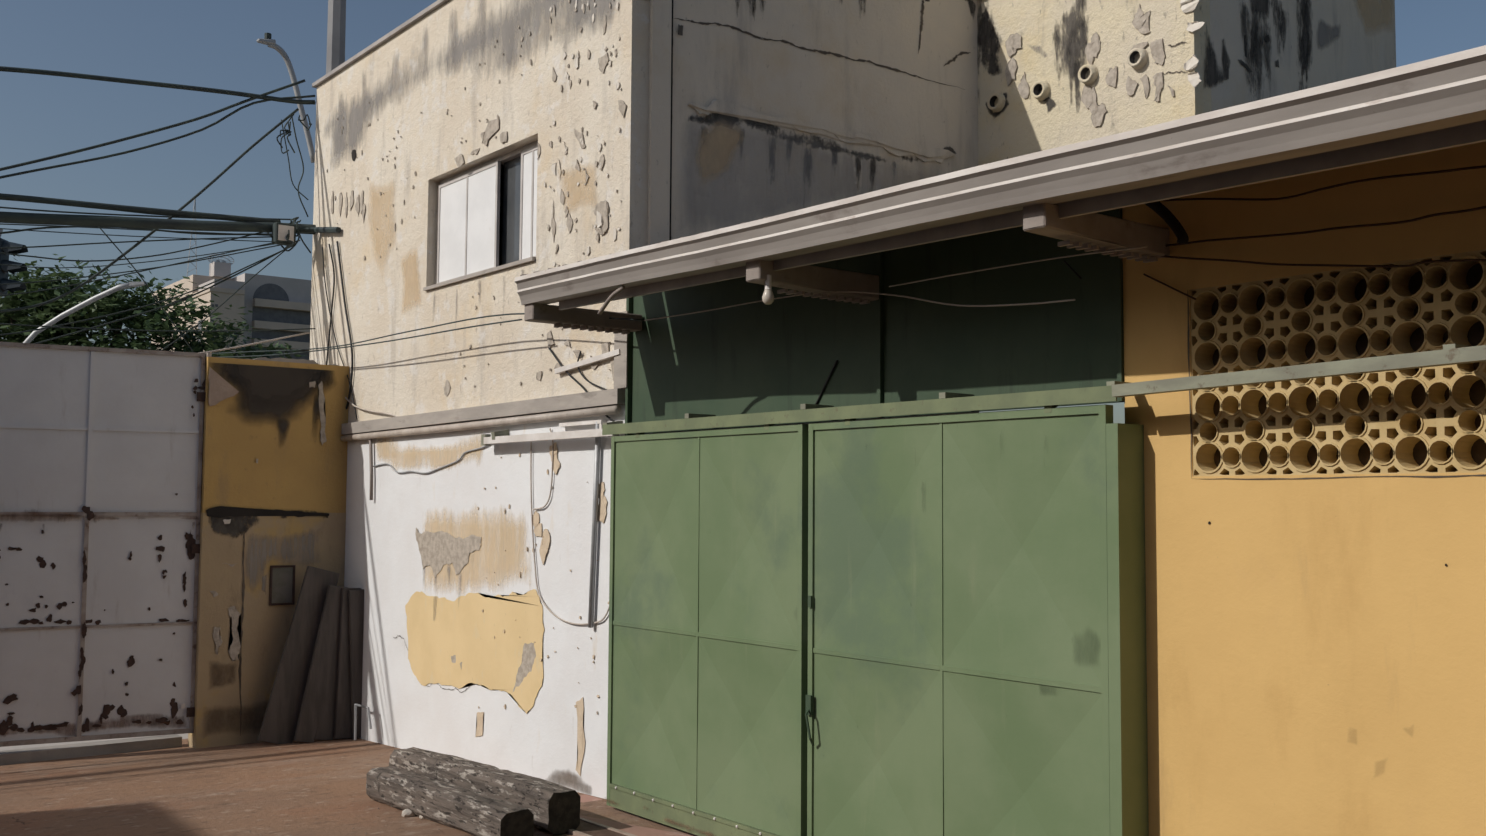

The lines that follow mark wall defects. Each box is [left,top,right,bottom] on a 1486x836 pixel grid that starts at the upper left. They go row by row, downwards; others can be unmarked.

crack [674,0,971,90]
water stain [1033,0,1087,106]
water stain [1204,0,1339,90]
peeling [537,0,627,267]
water stain [690,113,918,188]
water stain [214,363,330,438]
corrosion [0,547,56,569]
corrosion [148,518,197,635]
peeling [415,528,482,578]
corrosion [0,595,183,735]
peeling [405,572,556,714]
peeling [574,682,600,775]